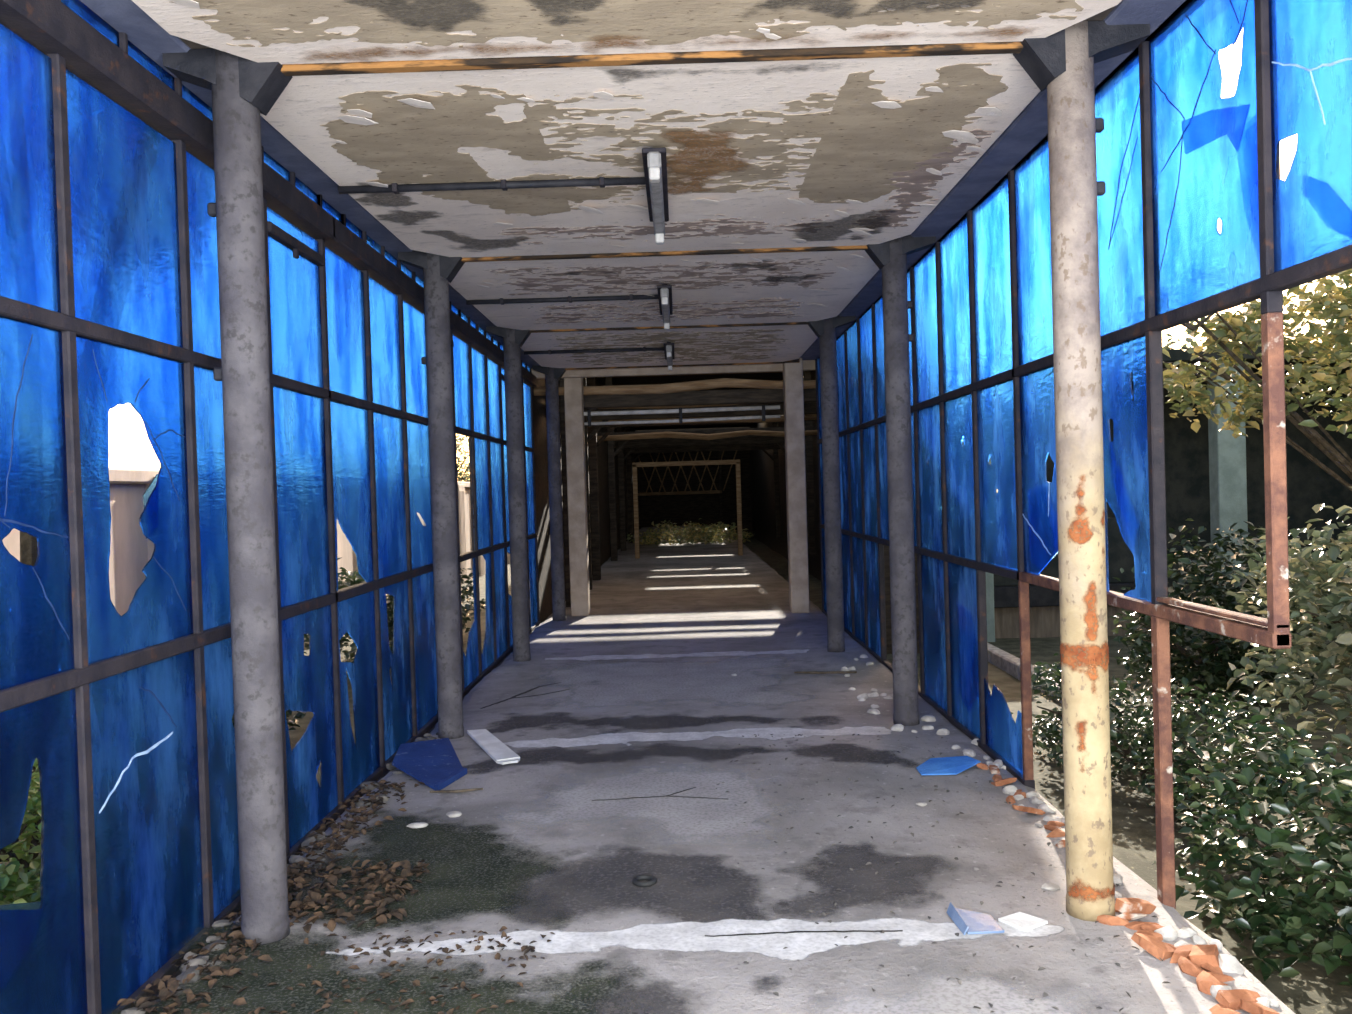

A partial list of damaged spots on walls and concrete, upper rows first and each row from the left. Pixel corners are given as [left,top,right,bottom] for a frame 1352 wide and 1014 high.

peeling [169,0,1084,48]
peeling [320,63,1008,365]
rust [1060,312,1292,909]
damp [509,845,943,923]
damp [596,984,686,1014]
damp [757,977,778,989]